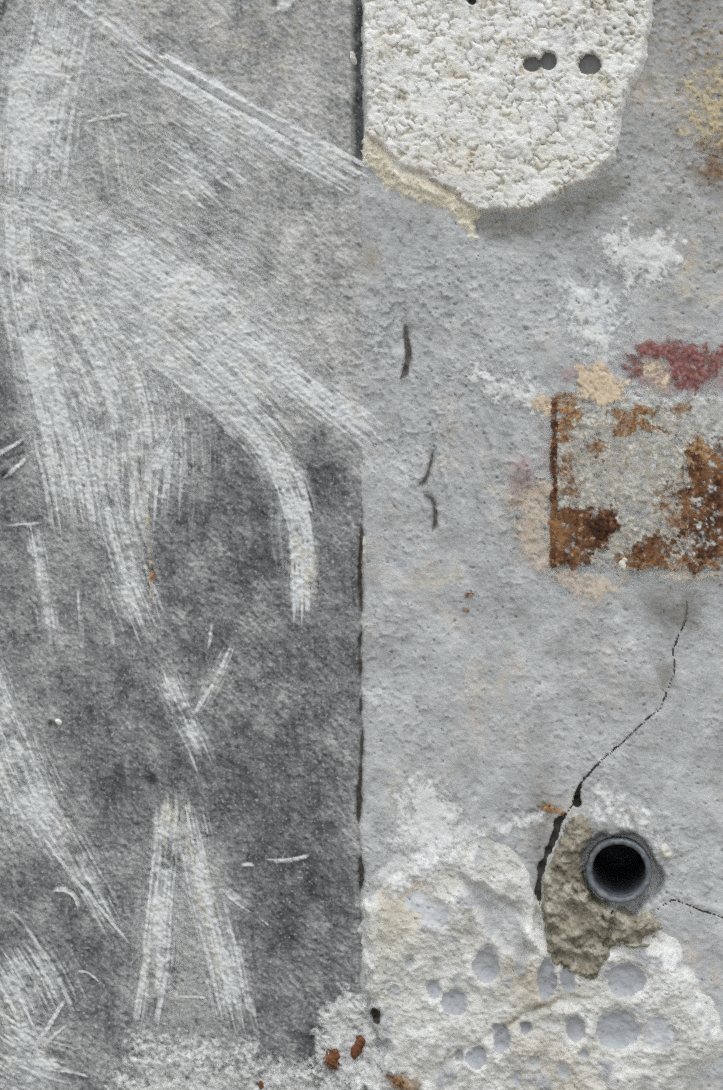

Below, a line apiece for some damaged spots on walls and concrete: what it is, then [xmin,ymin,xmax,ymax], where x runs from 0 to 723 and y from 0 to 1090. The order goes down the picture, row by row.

corrosion [547,393,723,586]
crack [534,601,688,905]
spalling [541,813,663,980]
crack [657,899,723,918]